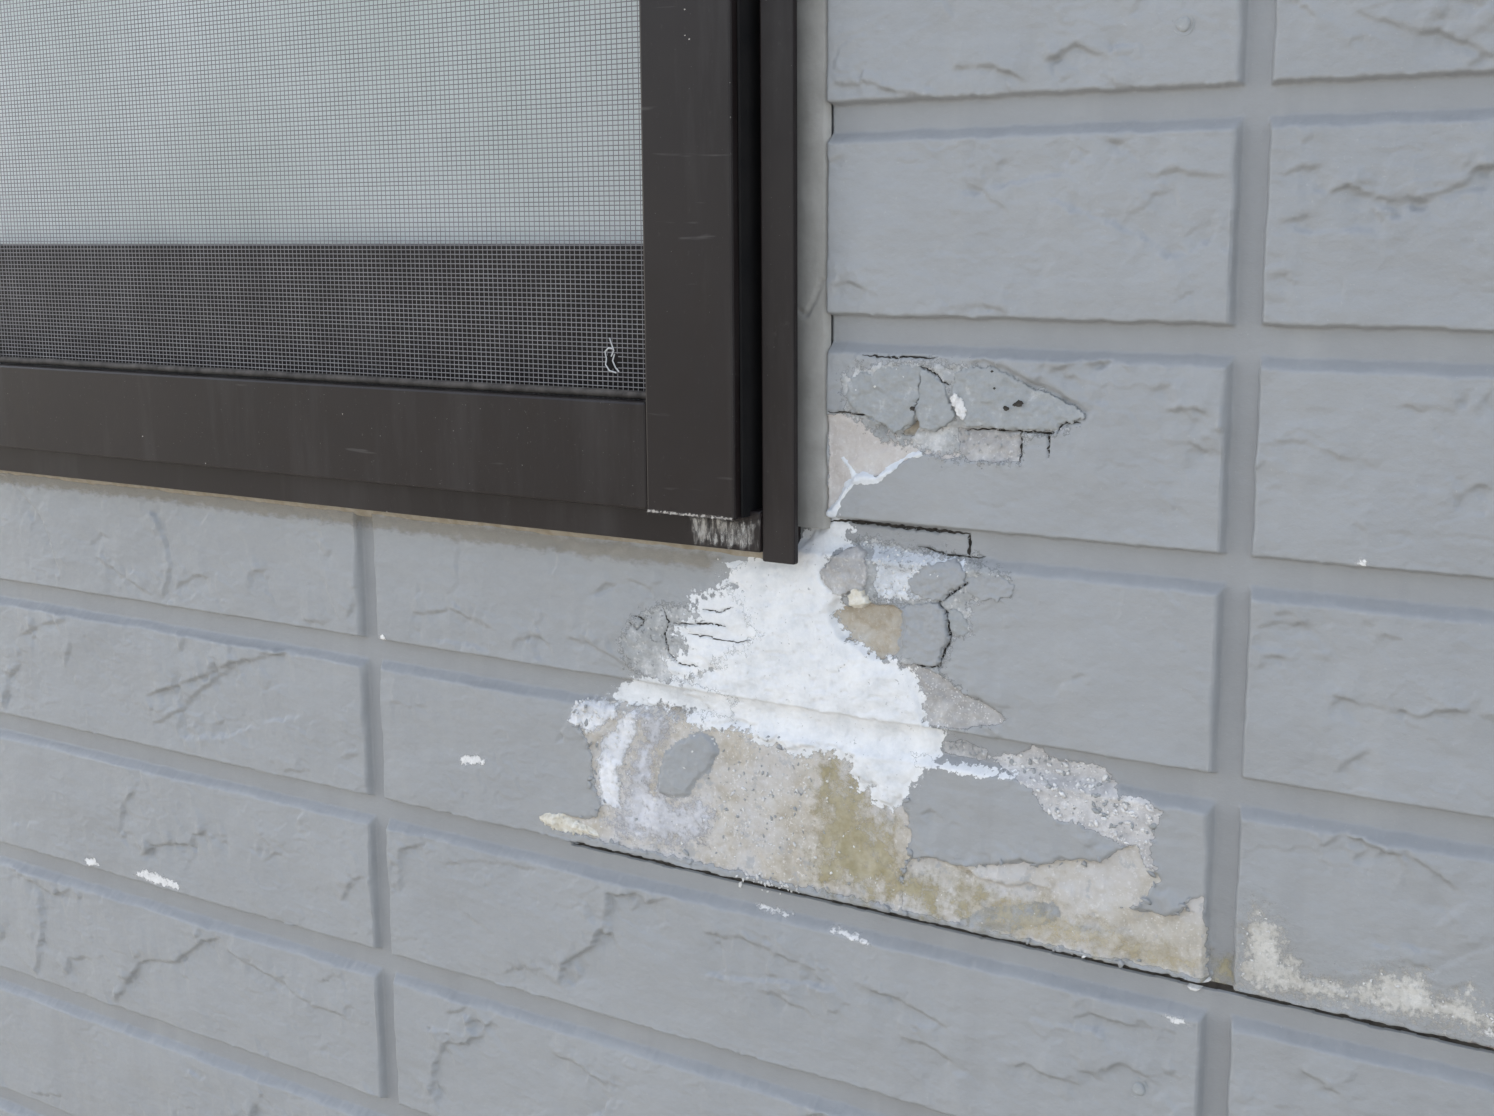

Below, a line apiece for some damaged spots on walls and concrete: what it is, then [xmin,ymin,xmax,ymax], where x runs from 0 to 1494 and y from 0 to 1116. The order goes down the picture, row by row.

peeling [827,358,1086,510]
spalling [563,534,1214,979]